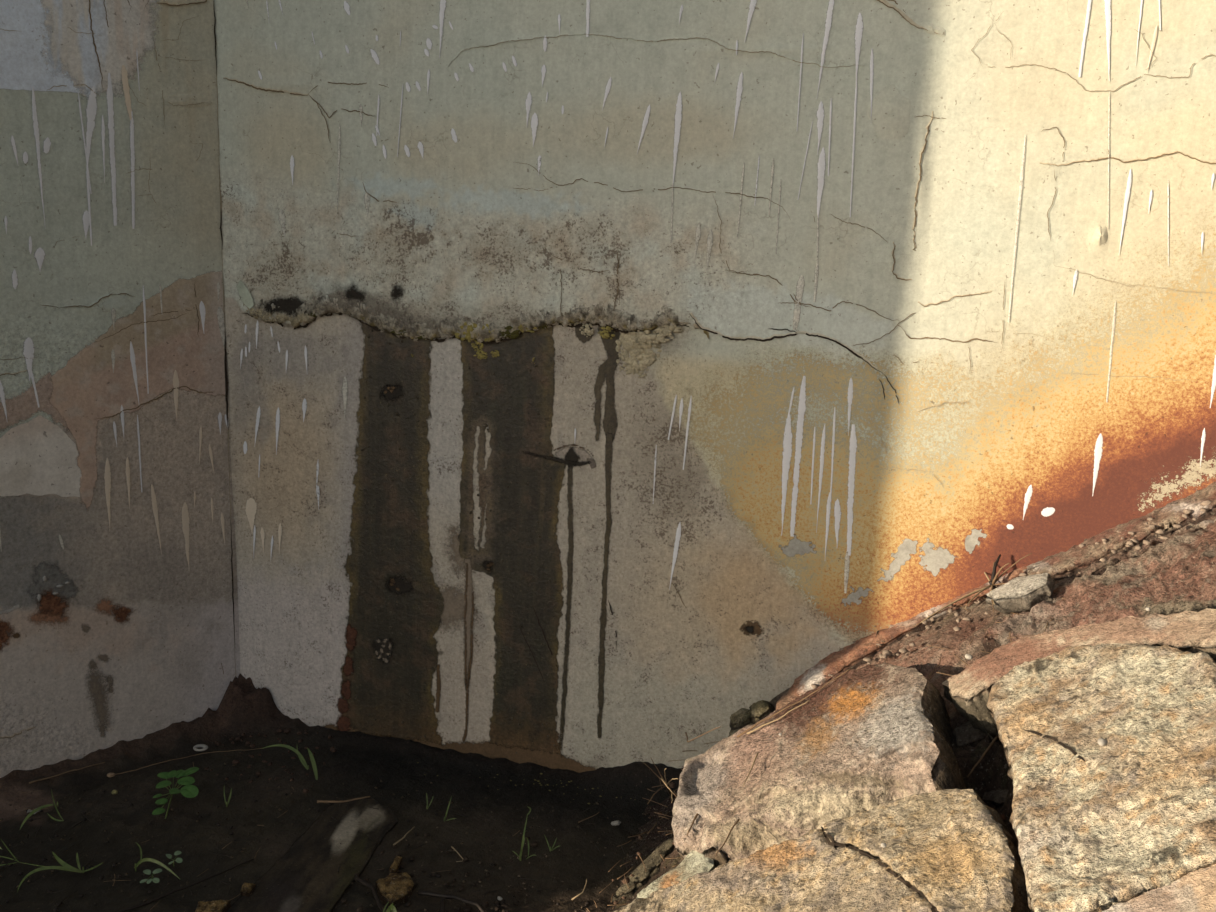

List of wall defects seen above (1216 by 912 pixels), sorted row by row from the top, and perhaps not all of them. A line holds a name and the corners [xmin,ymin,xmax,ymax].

peeling [41,0,159,99]
crack [971,12,1216,92]
spalling [27,562,78,623]
peeling [0,271,225,511]
crack [42,0,389,674]
damp [324,322,598,773]
flaking render [243,294,709,378]
spalling [524,444,596,469]
damp [575,325,621,738]
crack [516,111,1066,488]
corrosion [691,233,1216,640]
crack [1040,127,1216,294]